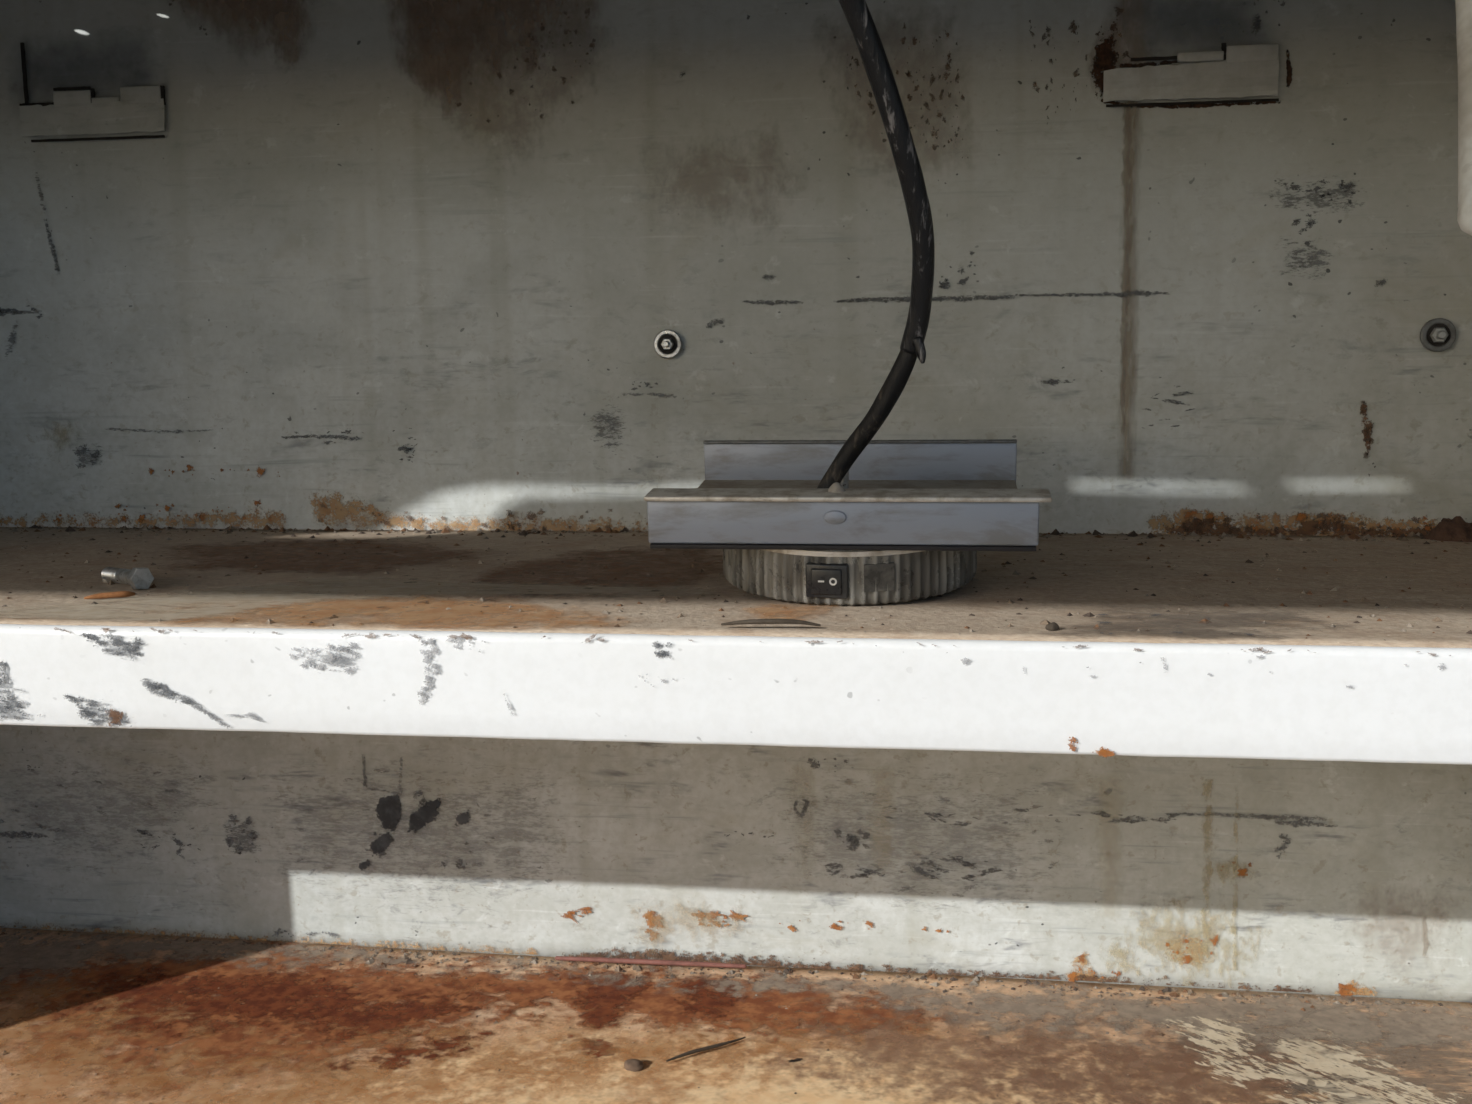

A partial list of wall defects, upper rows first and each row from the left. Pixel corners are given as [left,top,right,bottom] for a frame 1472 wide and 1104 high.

rust [1029,2,1293,119]
rust [1360,401,1376,476]
rust [0,491,648,573]
rust [1148,507,1437,536]
peeling [80,633,146,660]
rust [133,595,607,642]
peeling [0,661,41,720]
peeling [359,791,471,870]
rust [561,907,592,924]
rust [0,910,1382,1104]